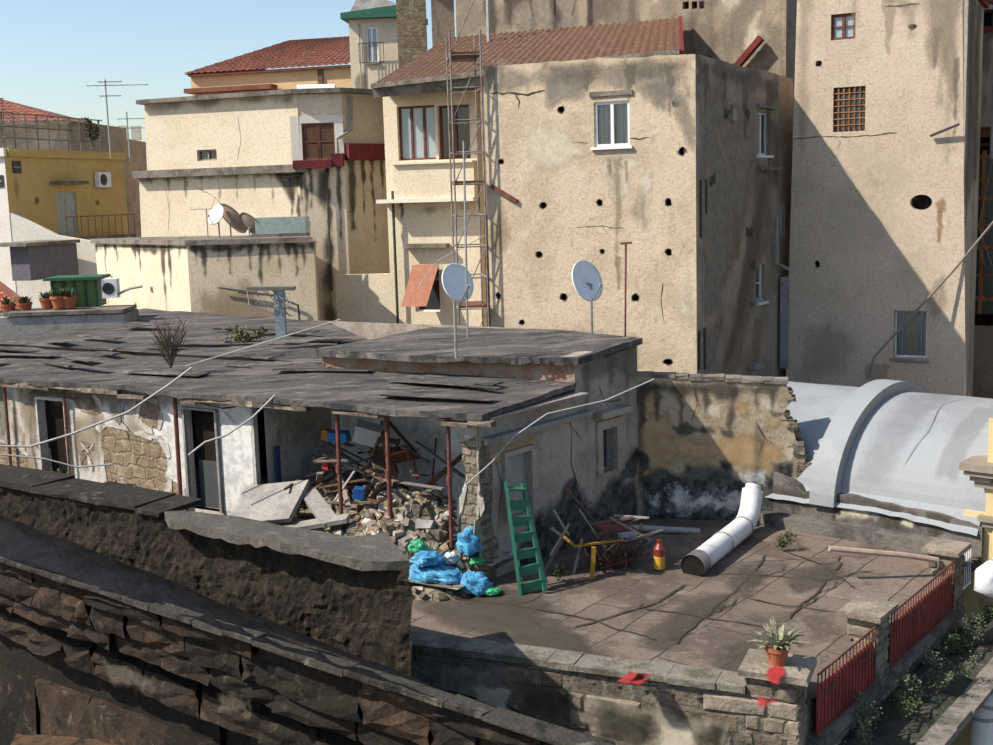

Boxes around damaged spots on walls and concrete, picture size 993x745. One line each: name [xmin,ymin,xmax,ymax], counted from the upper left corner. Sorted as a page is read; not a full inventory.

crack [489,90,545,109]
water stain [96,160,384,321]
spalling [26,388,186,496]
crack [569,422,581,487]
water stain [519,382,792,567]
peeling [638,387,811,478]
crack [454,548,874,643]